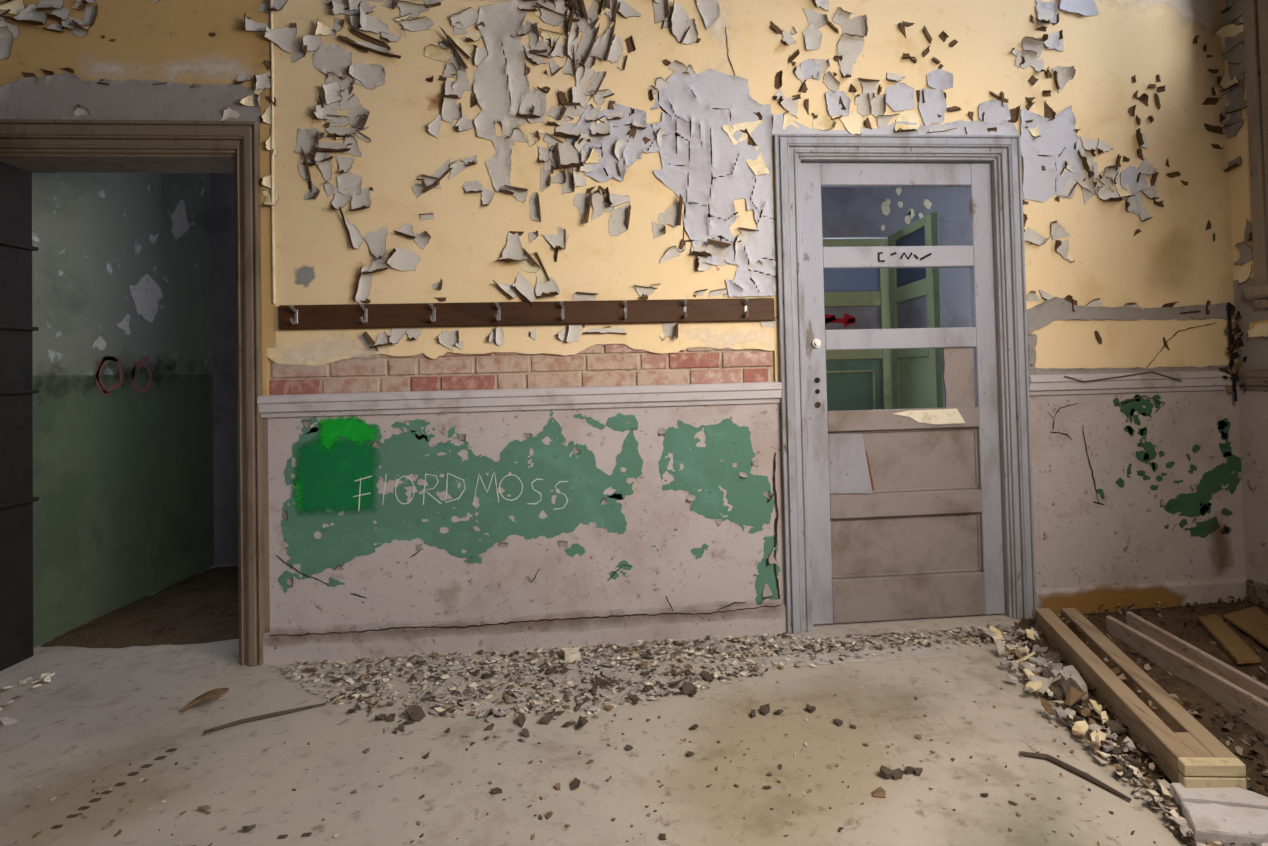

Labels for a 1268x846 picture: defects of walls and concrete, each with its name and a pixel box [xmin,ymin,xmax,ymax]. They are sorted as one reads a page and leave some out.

peeling [0,0,116,60]
peeling [0,60,278,157]
peeling [244,0,1189,307]
peeling [1163,0,1250,172]
peeling [149,200,189,244]
peeling [1234,219,1253,285]
peeling [92,335,106,350]
peeling [116,274,163,335]
peeling [1027,290,1268,375]
peeling [278,409,643,594]
peeling [658,418,781,605]
peeling [1096,394,1243,538]